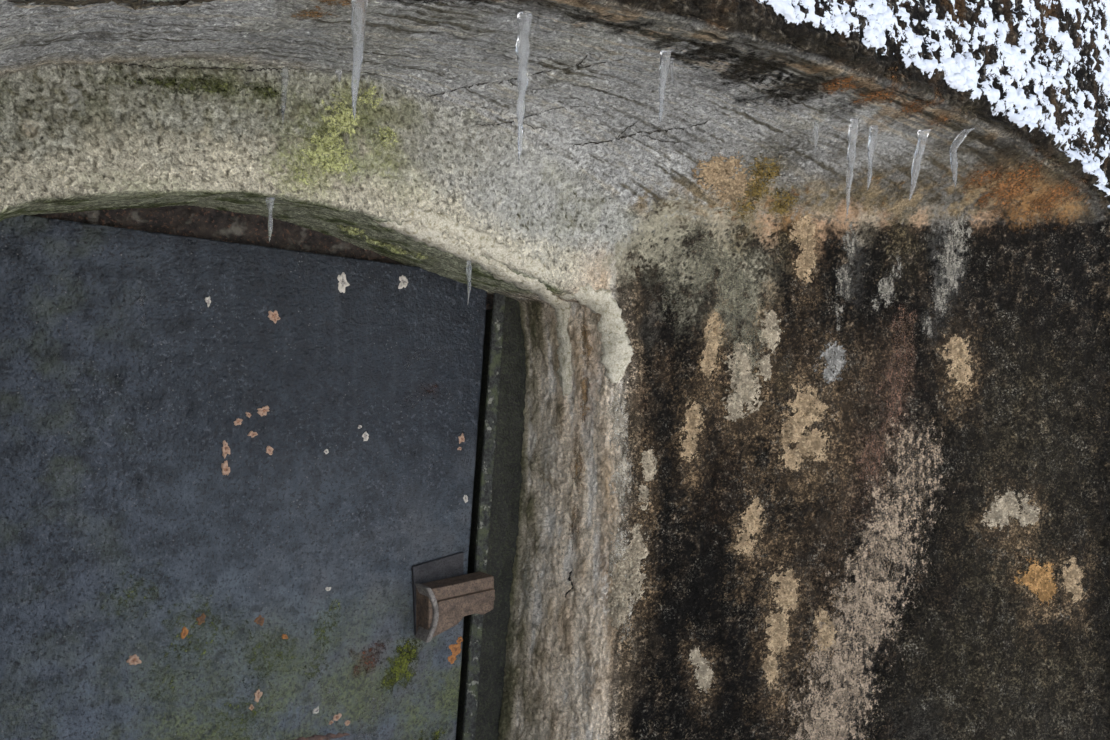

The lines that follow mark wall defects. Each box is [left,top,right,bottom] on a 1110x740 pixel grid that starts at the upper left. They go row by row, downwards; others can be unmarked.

leakage [659,223,766,366]
leakage [605,368,634,642]
leakage [781,210,973,740]